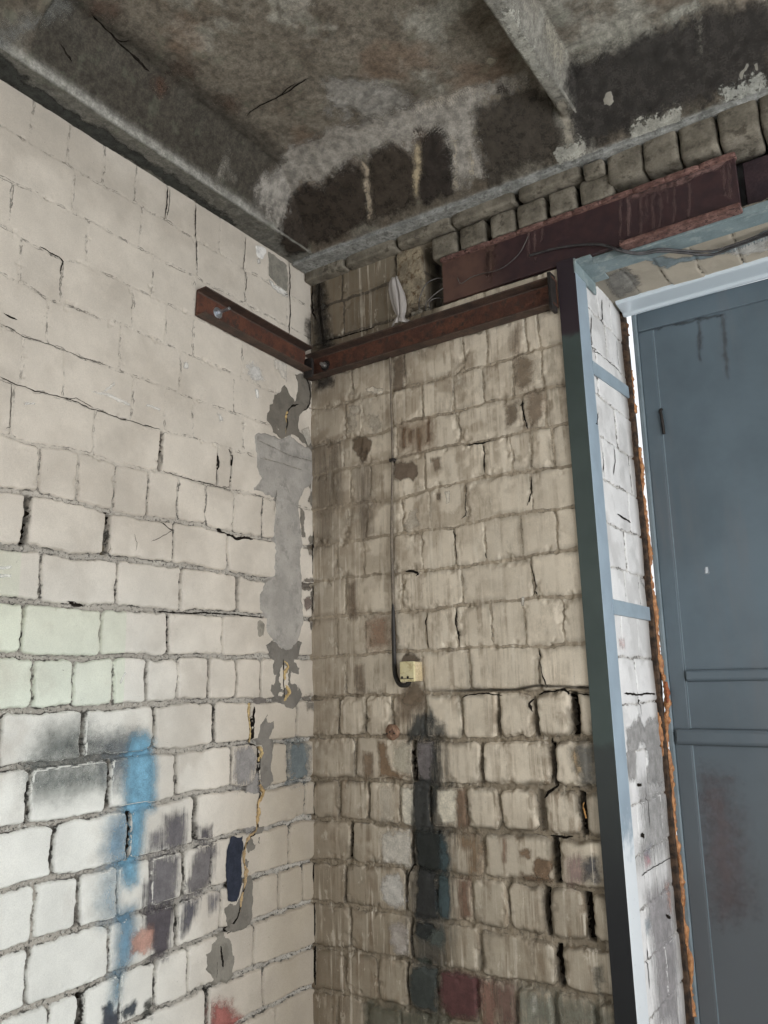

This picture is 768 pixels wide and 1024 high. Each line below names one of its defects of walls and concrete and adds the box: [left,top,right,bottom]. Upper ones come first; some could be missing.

crack [92,15,150,72]
crack [249,78,308,113]
water stain [253,0,768,257]
peeling [603,91,614,106]
crack [1,377,158,429]
flaking render [267,373,313,452]
peeling [300,483,313,555]
peeling [301,578,314,630]
water stain [401,653,420,662]
crack [223,703,265,934]
water stain [363,742,438,834]
water stain [414,789,482,921]